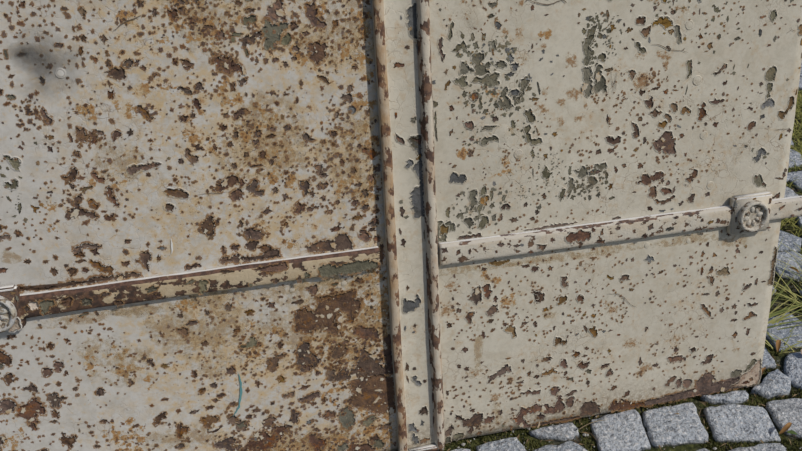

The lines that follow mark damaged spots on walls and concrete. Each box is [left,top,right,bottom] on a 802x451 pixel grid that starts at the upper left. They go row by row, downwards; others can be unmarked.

peeling [400,2,418,54]
rust [303,1,379,149]
peeling [394,116,425,220]
peeling [0,0,396,451]
peeling [432,0,798,443]
peeling [401,285,422,314]
rust [298,266,390,407]
rust [84,340,155,390]
rust [608,371,742,413]
rust [102,417,154,451]
peeling [407,405,431,446]
rust [531,415,581,428]